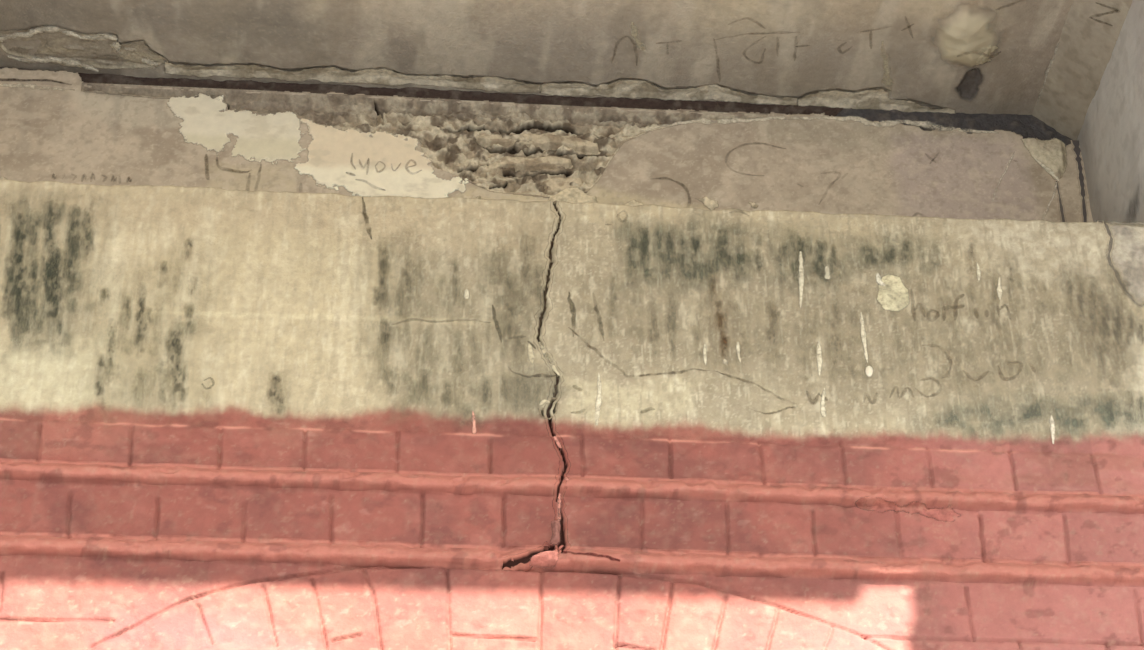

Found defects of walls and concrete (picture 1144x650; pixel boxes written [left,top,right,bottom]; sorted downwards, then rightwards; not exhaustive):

spalling [0,26,998,199]
water stain [6,206,91,333]
water stain [627,226,758,289]
water stain [785,240,834,280]
spalling [1104,222,1144,307]
water stain [127,299,144,341]
water stain [168,332,185,393]
crack [492,201,620,572]
crack [639,369,793,414]
water stain [981,403,1085,432]
water stain [1084,402,1142,427]